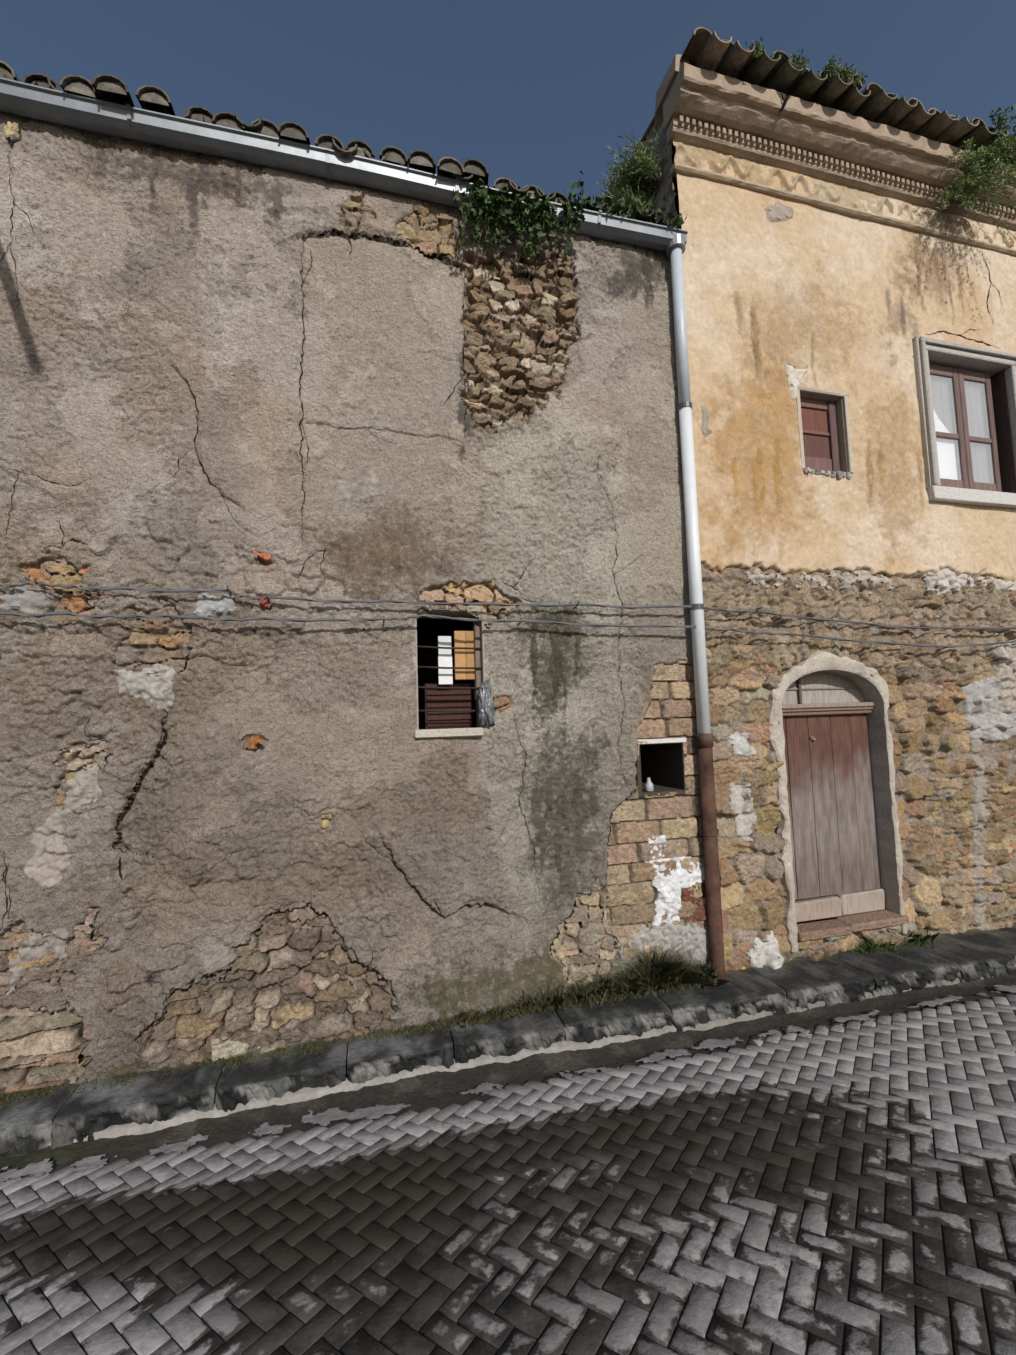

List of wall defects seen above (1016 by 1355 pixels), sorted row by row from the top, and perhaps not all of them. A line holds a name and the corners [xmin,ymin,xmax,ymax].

crack [0,148,34,305]
spalling [396,202,580,435]
crack [174,368,239,519]
crack [294,228,466,595]
spalling [0,558,105,626]
crack [112,709,168,881]
crack [366,841,500,918]
water stain [519,607,610,923]
spalling [549,661,723,993]
spalling [0,907,106,1093]
spalling [141,903,397,1065]